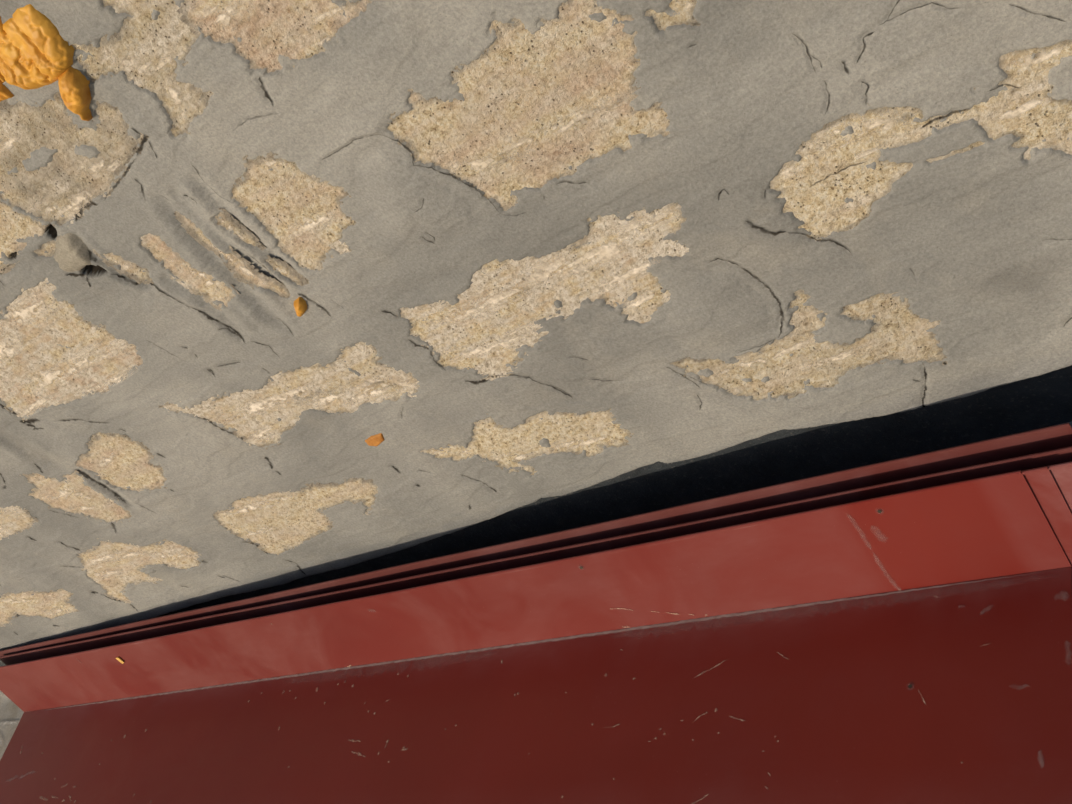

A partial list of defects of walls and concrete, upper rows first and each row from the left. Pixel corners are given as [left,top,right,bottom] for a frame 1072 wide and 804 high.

spalling [0,278,143,422]
crack [45,128,157,239]
crack [66,251,292,375]
spalling [72,0,372,137]
spalling [93,151,356,311]
spalling [158,341,420,450]
spalling [420,409,634,475]
spalling [396,202,689,381]
spalling [387,0,701,211]
crack [710,258,783,334]
spalling [670,289,948,400]
spalling [770,39,1072,240]